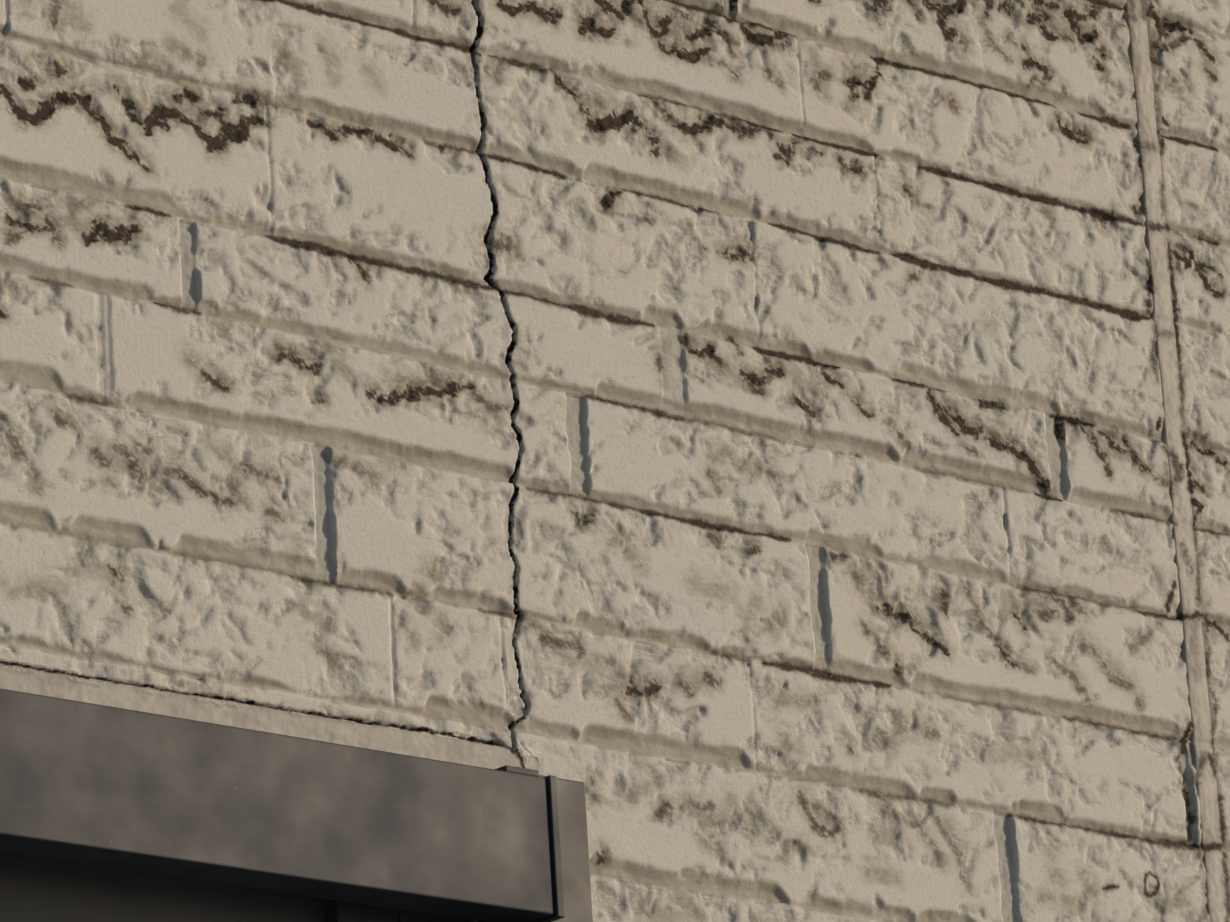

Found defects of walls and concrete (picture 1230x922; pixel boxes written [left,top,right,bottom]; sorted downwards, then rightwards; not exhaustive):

leakage [578,0,735,64]
leakage [906,0,966,51]
leakage [1022,44,1052,88]
leakage [983,0,1127,72]
leakage [113,85,269,153]
leakage [426,142,566,180]
leakage [639,95,878,166]
leakage [1056,113,1131,137]
leakage [82,205,170,247]
crack [0,0,527,768]
leakage [677,334,845,395]
leakage [891,378,1026,460]